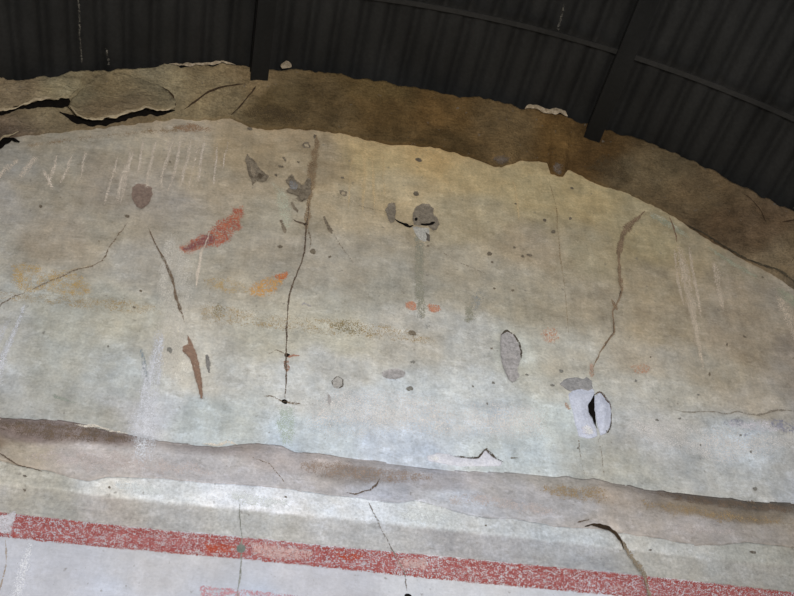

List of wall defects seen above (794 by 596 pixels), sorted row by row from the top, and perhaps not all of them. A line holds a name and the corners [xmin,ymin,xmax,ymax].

water stain [525,104,568,116]
spalling [245,154,312,213]
spalling [385,202,396,223]
spalling [412,191,440,247]
crack [150,231,203,399]
crack [267,135,320,405]
crack [590,211,645,377]
water stain [674,245,704,369]
spalling [490,330,528,382]
peeling [594,393,611,435]
crack [678,408,792,416]
crack [578,519,651,596]